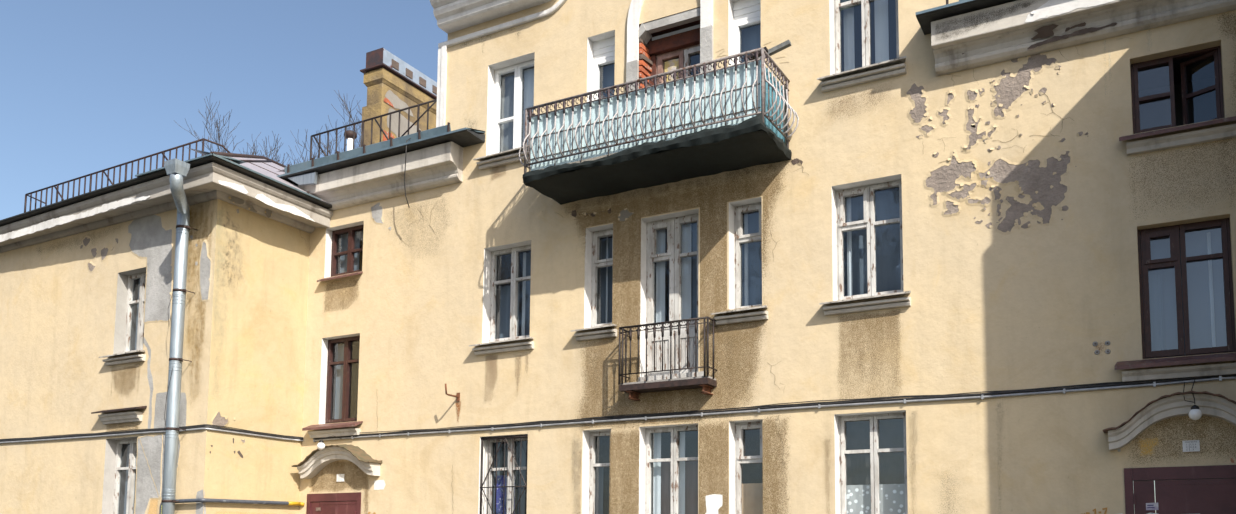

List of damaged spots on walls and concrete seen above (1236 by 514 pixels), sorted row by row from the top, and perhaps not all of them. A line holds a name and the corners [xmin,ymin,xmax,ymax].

peeling [903,0,1117,235]
peeling [0,195,152,242]
spalling [190,235,212,302]
flaking render [80,214,187,514]
water stain [483,354,498,403]
water stain [565,161,791,514]
water stain [836,309,904,401]